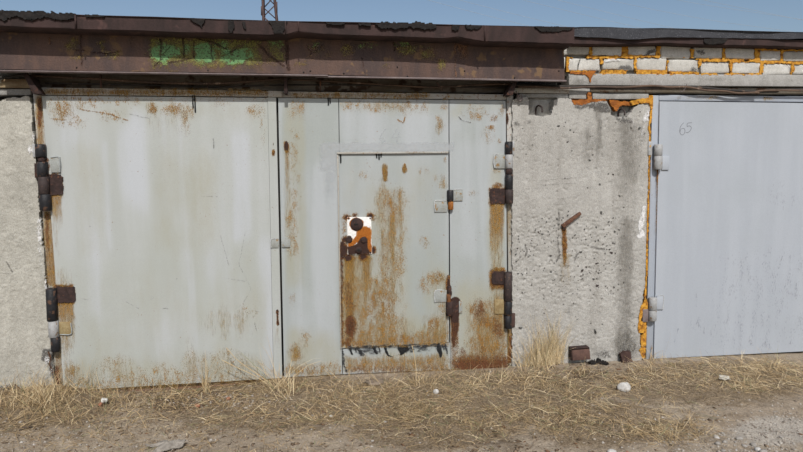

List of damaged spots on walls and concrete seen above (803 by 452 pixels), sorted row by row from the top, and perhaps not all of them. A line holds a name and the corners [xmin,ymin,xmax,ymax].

rust [36,88,298,168]
spalling [572,101,645,134]
rust [44,195,73,288]
rust [286,165,512,376]
spalling [514,211,630,305]